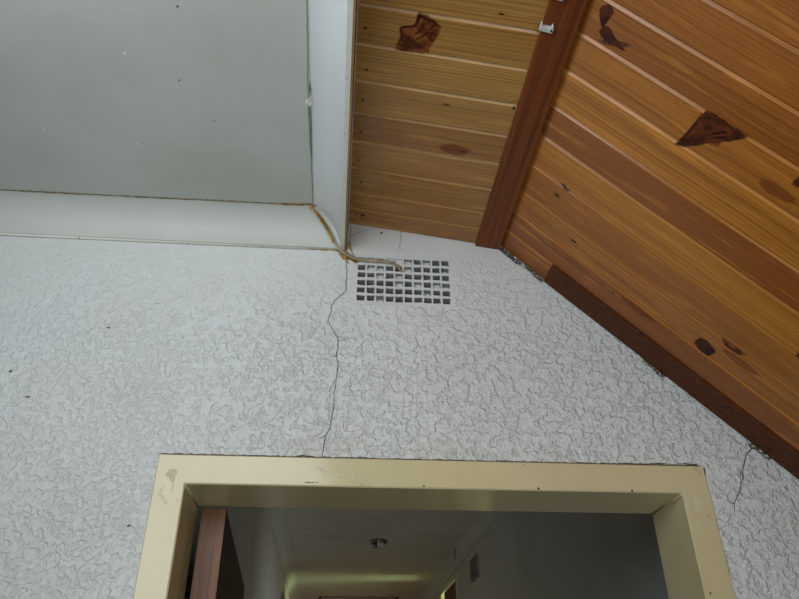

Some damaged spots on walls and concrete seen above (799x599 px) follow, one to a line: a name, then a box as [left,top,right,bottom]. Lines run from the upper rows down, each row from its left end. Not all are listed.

crack [161,226,706,474]
crack [729,448,753,511]